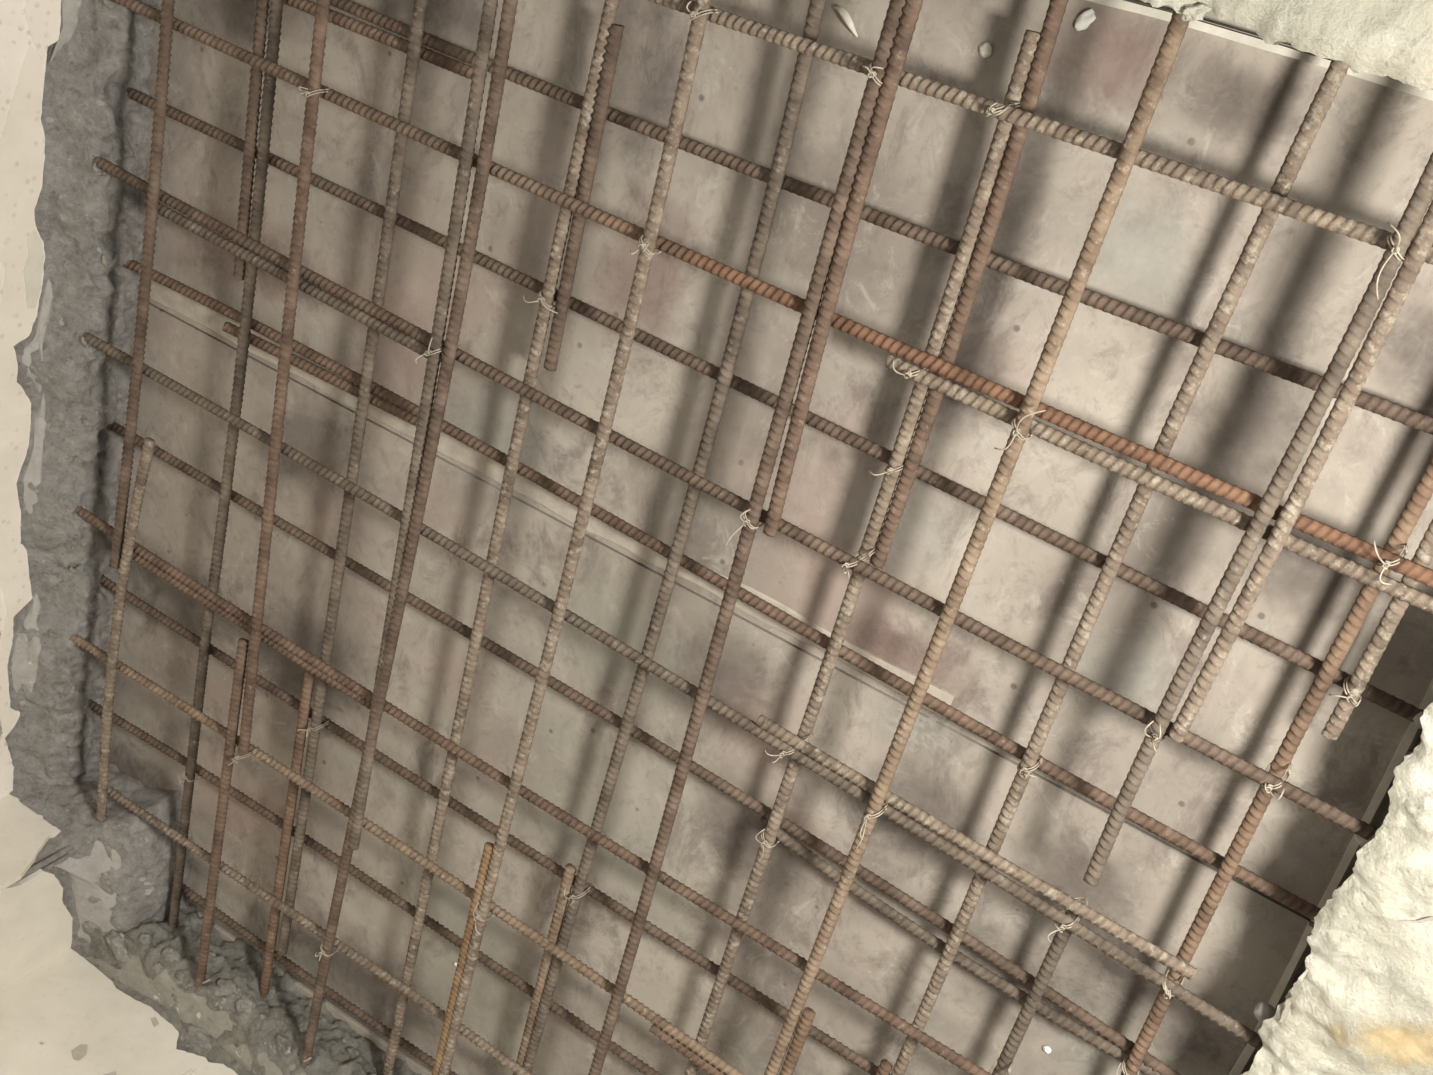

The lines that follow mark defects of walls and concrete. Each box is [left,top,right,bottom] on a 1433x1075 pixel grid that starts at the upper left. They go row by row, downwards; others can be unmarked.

spalling [0,0,518,1075]
spalling [372,0,1433,1075]
corrosion [1361,1027,1433,1066]